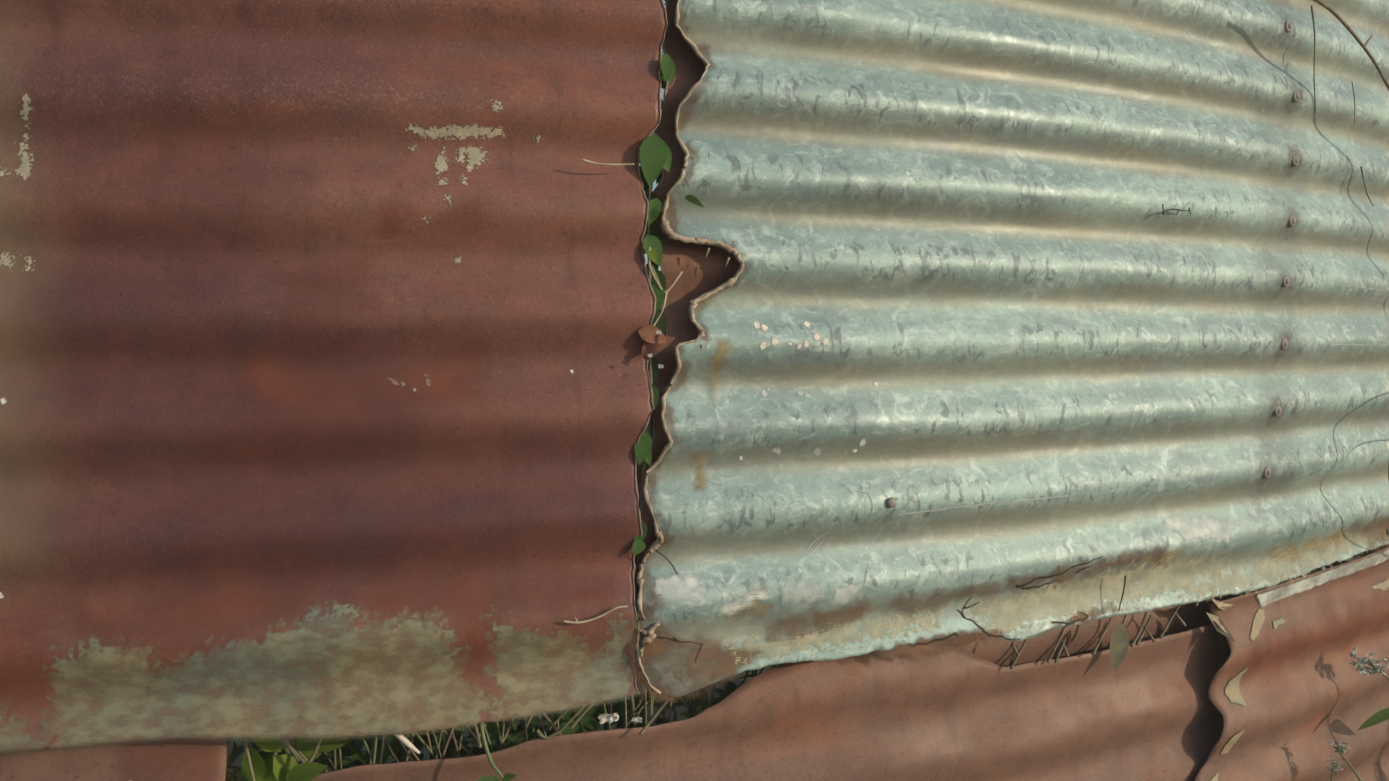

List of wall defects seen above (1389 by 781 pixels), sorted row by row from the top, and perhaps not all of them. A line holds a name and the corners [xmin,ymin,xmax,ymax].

peeling [0,93,35,180]
peeling [405,100,505,206]
peeling [0,251,35,272]
corrosion [631,628,755,700]
corrosion [882,629,1004,659]
corrosion [1057,610,1105,626]